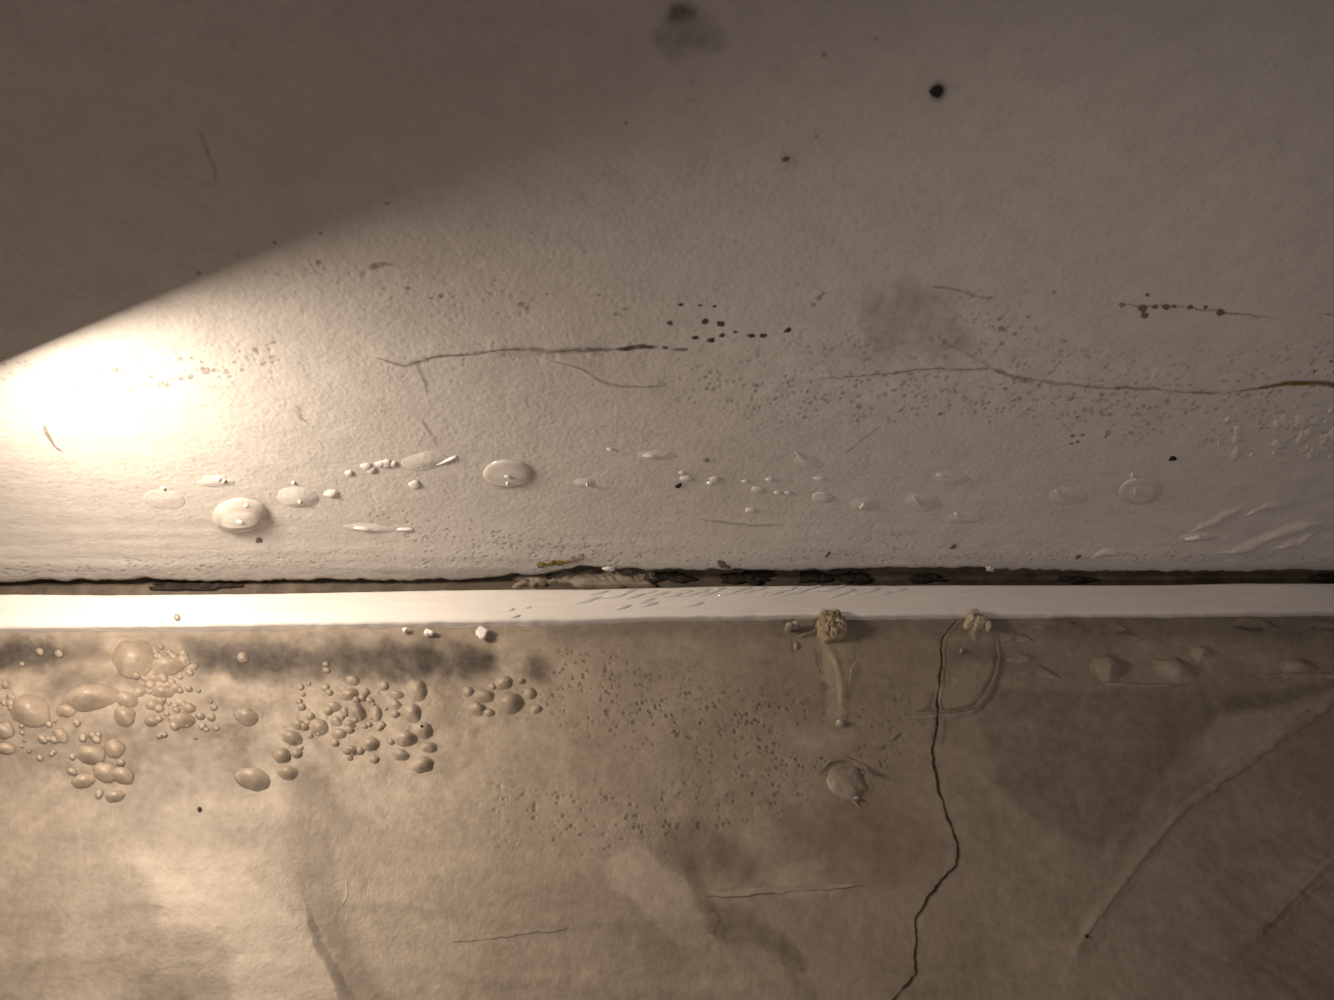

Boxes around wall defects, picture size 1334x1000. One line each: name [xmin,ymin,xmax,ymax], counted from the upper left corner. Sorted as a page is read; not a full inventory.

crack [587,344,686,352]
crack [1259,381,1334,389]
damp [573,585,906,685]
damp [0,642,57,668]
damp [206,644,494,676]
crack [892,618,959,1000]